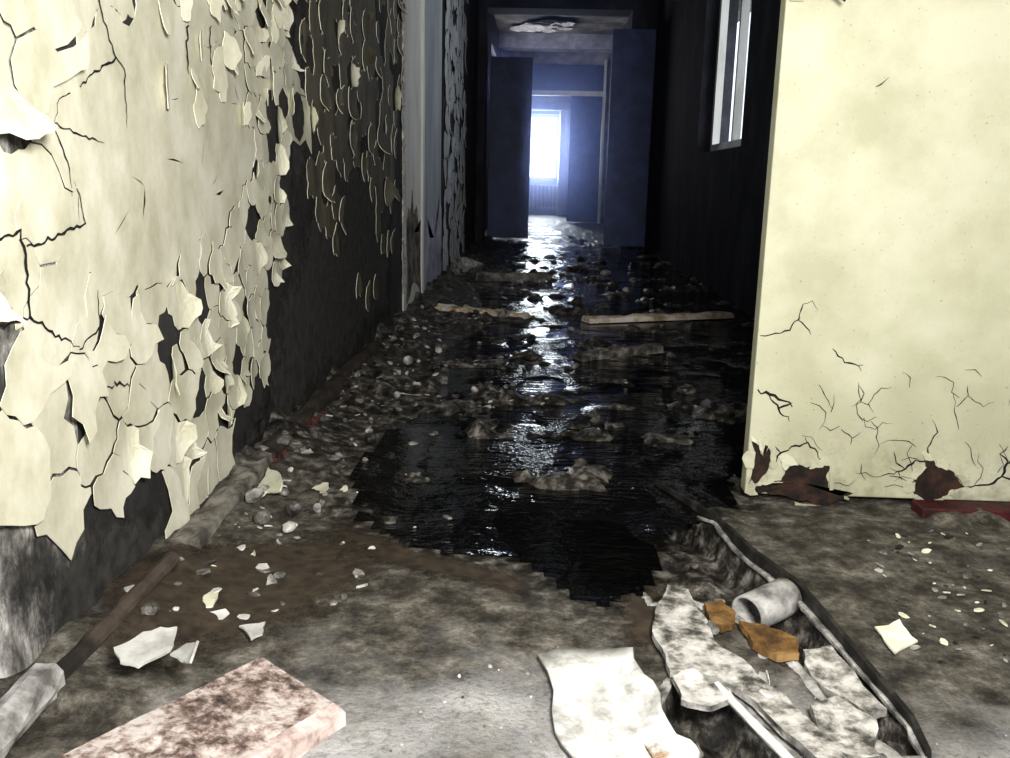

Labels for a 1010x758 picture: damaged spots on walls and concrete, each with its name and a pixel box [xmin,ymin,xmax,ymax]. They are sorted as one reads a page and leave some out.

crack [0,0,127,350]
peeling [0,0,469,560]
crack [760,301,818,337]
crack [757,349,1010,488]